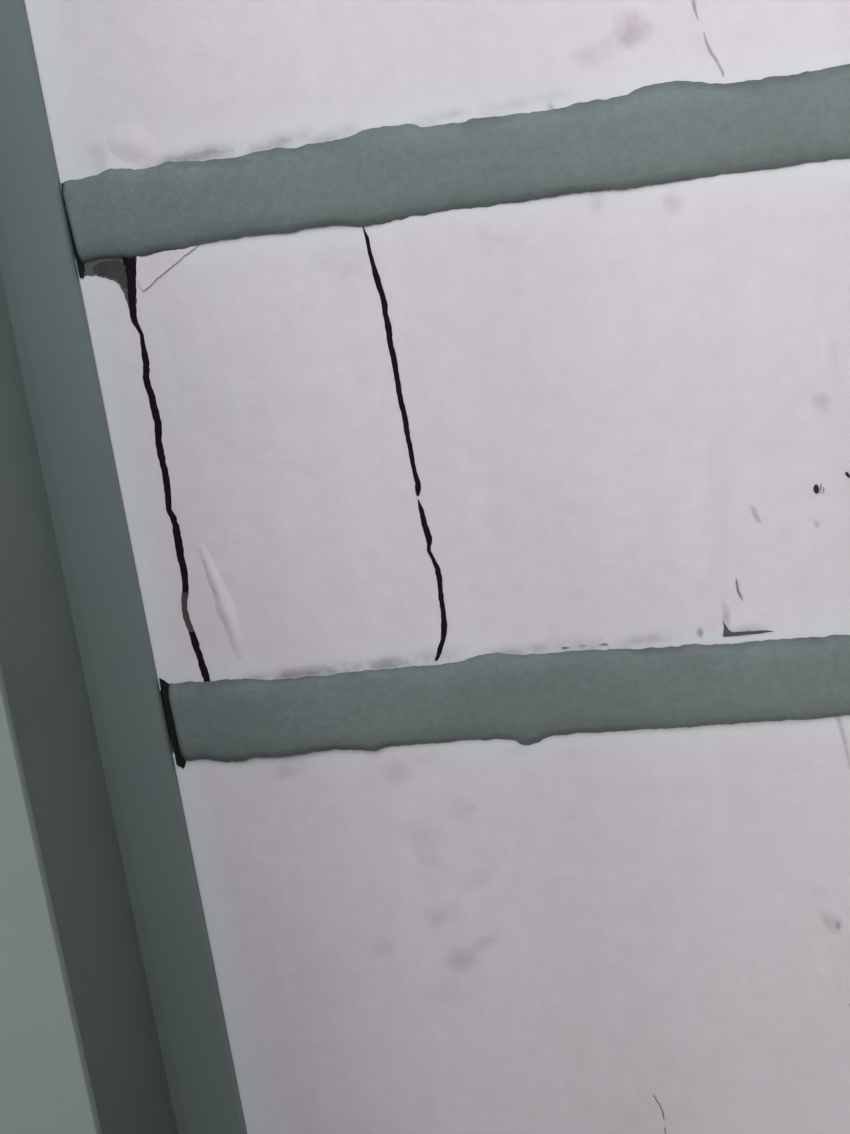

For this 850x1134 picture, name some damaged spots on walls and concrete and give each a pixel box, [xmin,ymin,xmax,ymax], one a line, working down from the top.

crack [122,257,210,682]
crack [362,226,447,661]